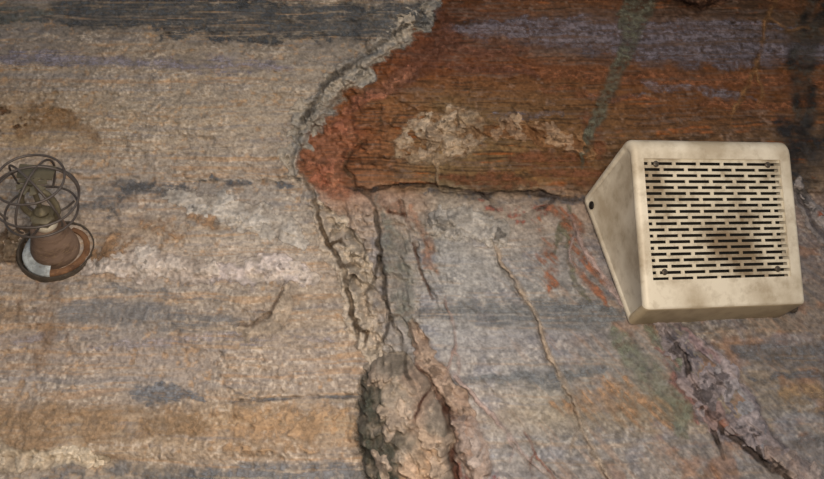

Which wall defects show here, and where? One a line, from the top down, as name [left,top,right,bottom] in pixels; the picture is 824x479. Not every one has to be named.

spalling [277,0,442,181]
water stain [447,0,824,204]
spalling [394,104,599,164]
crack [467,190,492,199]
crack [525,191,574,208]
crack [312,166,405,347]
crack [569,235,623,306]
crack [252,395,289,403]
crack [326,392,353,400]
crack [404,360,450,418]
crack [449,447,459,479]
crack [711,423,790,479]